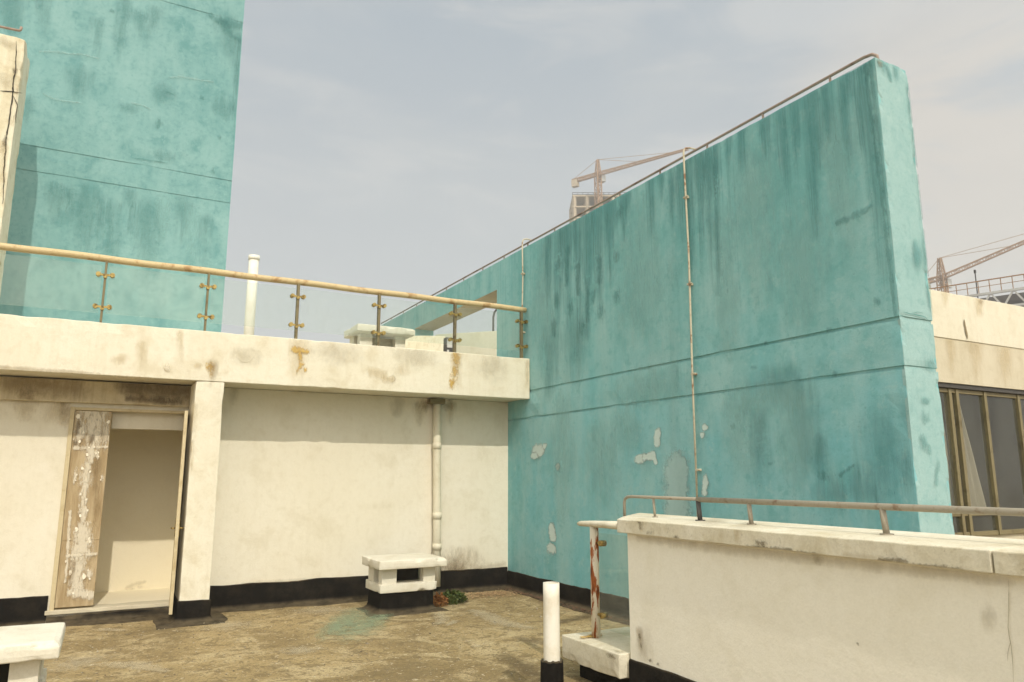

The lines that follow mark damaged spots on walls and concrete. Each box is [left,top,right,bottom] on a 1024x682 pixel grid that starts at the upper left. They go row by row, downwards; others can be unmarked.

crack [0,45,20,204]
corrosion [291,346,309,372]
peeling [530,443,547,459]
peeling [634,428,661,465]
peeling [547,522,556,554]